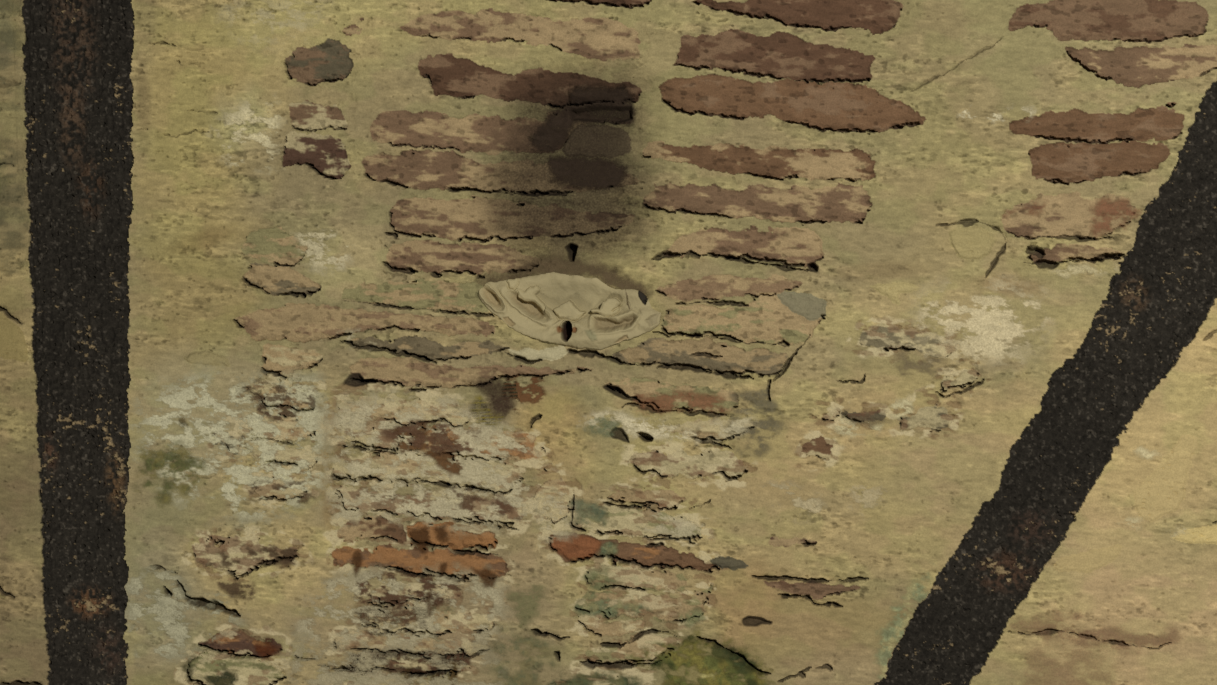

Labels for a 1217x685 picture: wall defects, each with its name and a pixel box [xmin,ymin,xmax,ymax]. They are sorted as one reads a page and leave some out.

crack [0,306,22,324]
spalling [173,0,938,685]
spalling [794,282,995,472]
crack [0,586,15,599]